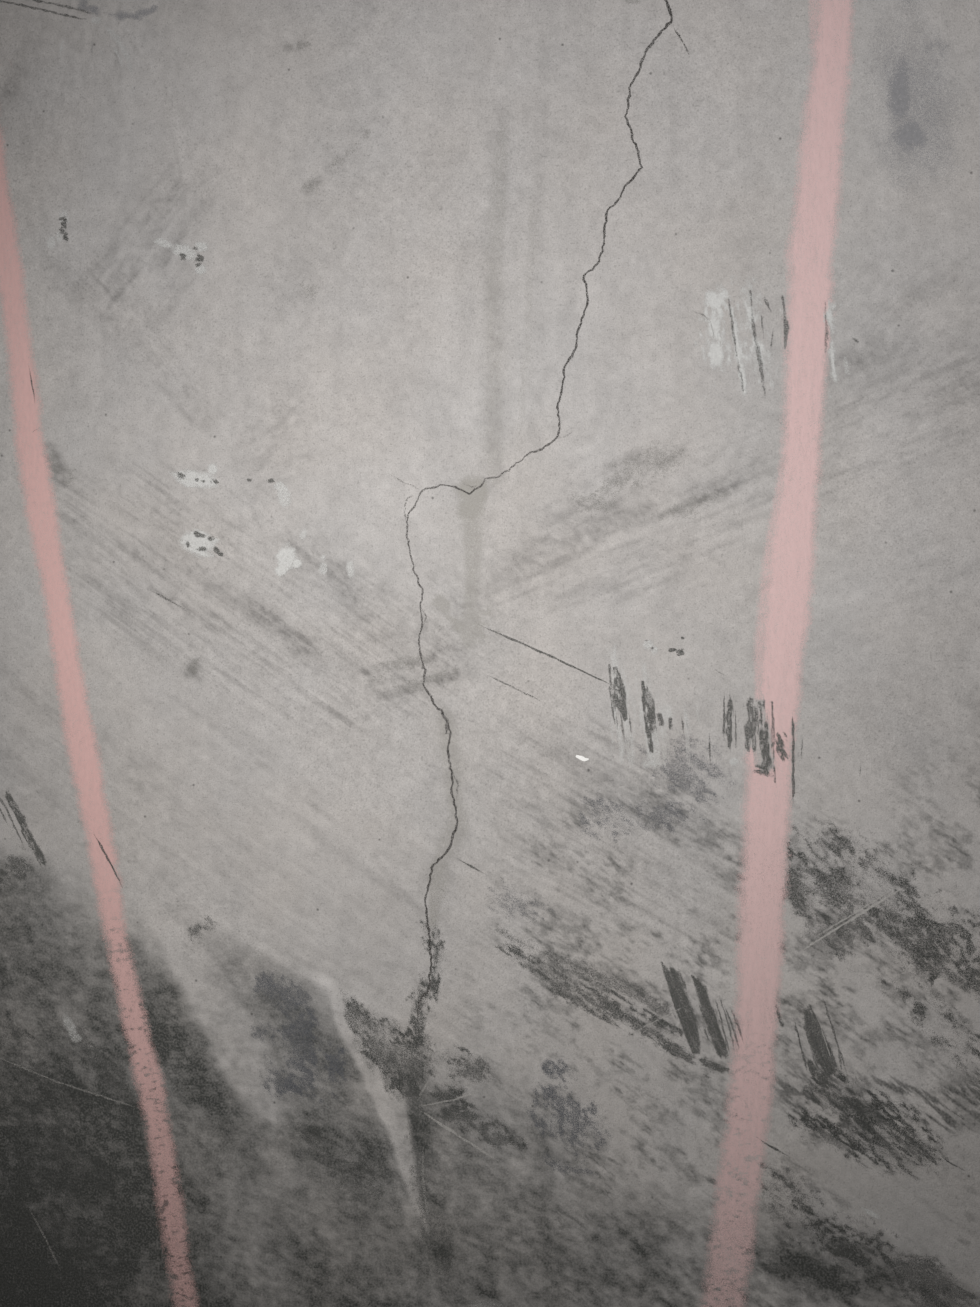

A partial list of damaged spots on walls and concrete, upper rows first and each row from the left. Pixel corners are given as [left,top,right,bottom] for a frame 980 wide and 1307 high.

crack [391,0,689,1022]
damp [427,707,471,926]
damp [712,1001,744,1050]